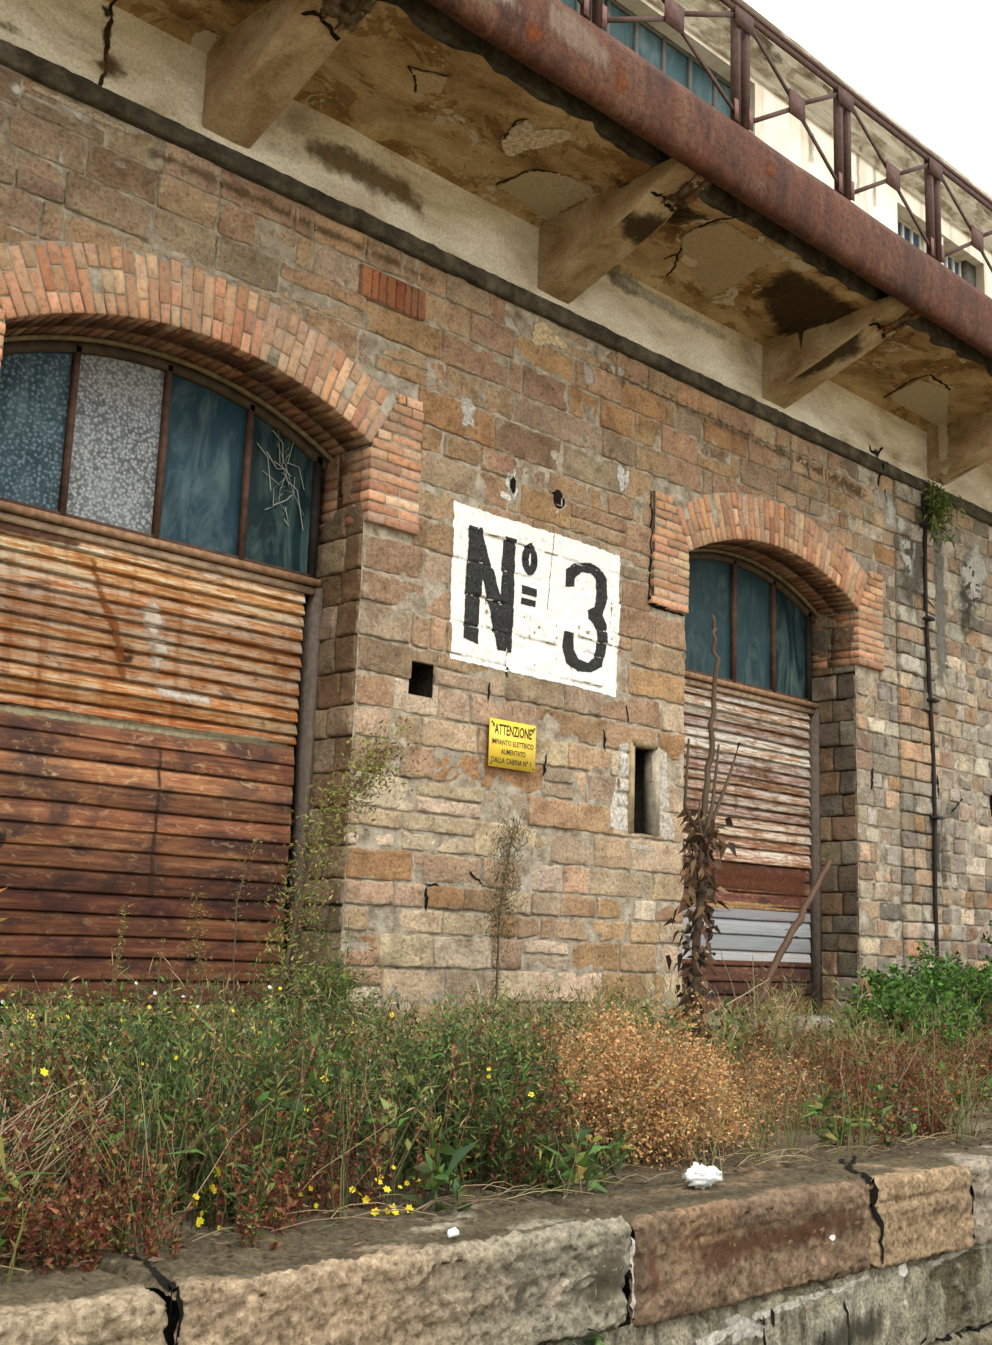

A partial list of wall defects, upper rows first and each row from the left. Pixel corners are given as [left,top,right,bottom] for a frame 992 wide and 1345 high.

spalling [301,0,378,41]
corrosion [527,1,629,92]
peeling [501,118,572,157]
damp [270,141,421,211]
peeling [496,169,595,241]
damp [621,207,705,243]
damp [759,271,858,348]
damp [796,332,861,379]
crack [839,1156,884,1264]
crack [117,1249,184,1345]
crack [759,1309,775,1345]
crack [920,1321,992,1345]